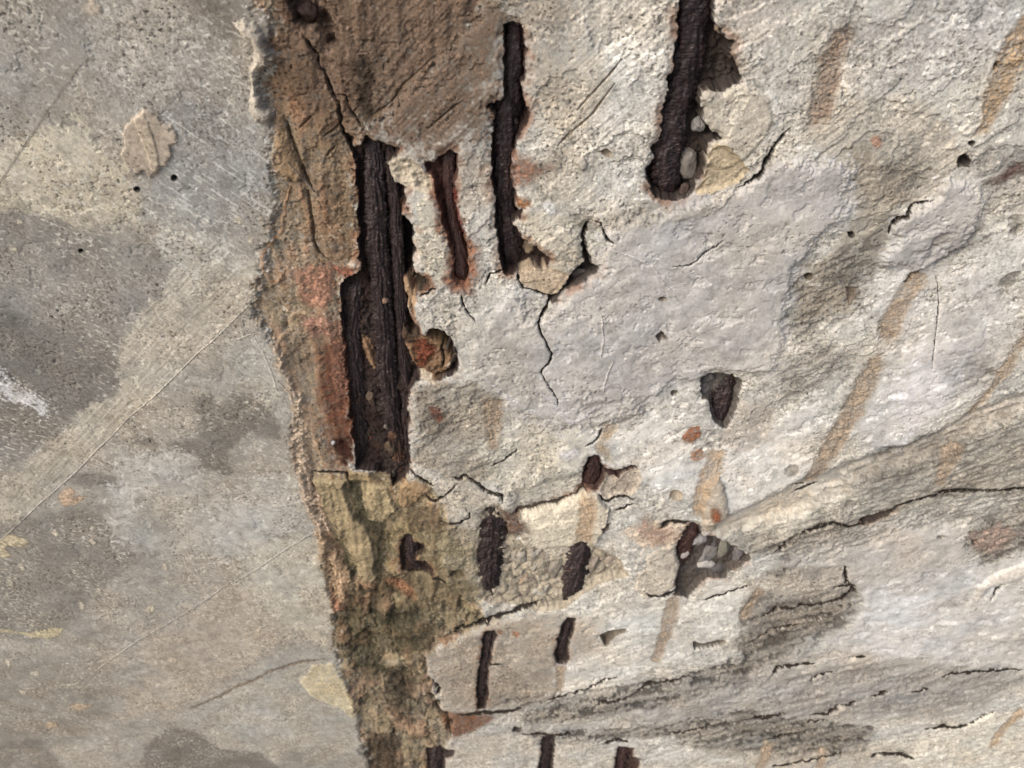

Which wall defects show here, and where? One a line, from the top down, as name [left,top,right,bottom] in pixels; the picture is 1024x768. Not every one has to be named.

rust [294,265,354,465]
rust [443,189,477,293]
crack [485,263,558,405]
peeling [313,0,857,582]
crack [410,449,634,525]
crack [894,487,1024,507]
spalling [475,455,750,664]
spalling [477,630,497,708]
spalling [539,735,554,768]
crack [548,675,701,706]
spalling [614,746,640,768]
crack [666,667,1024,767]